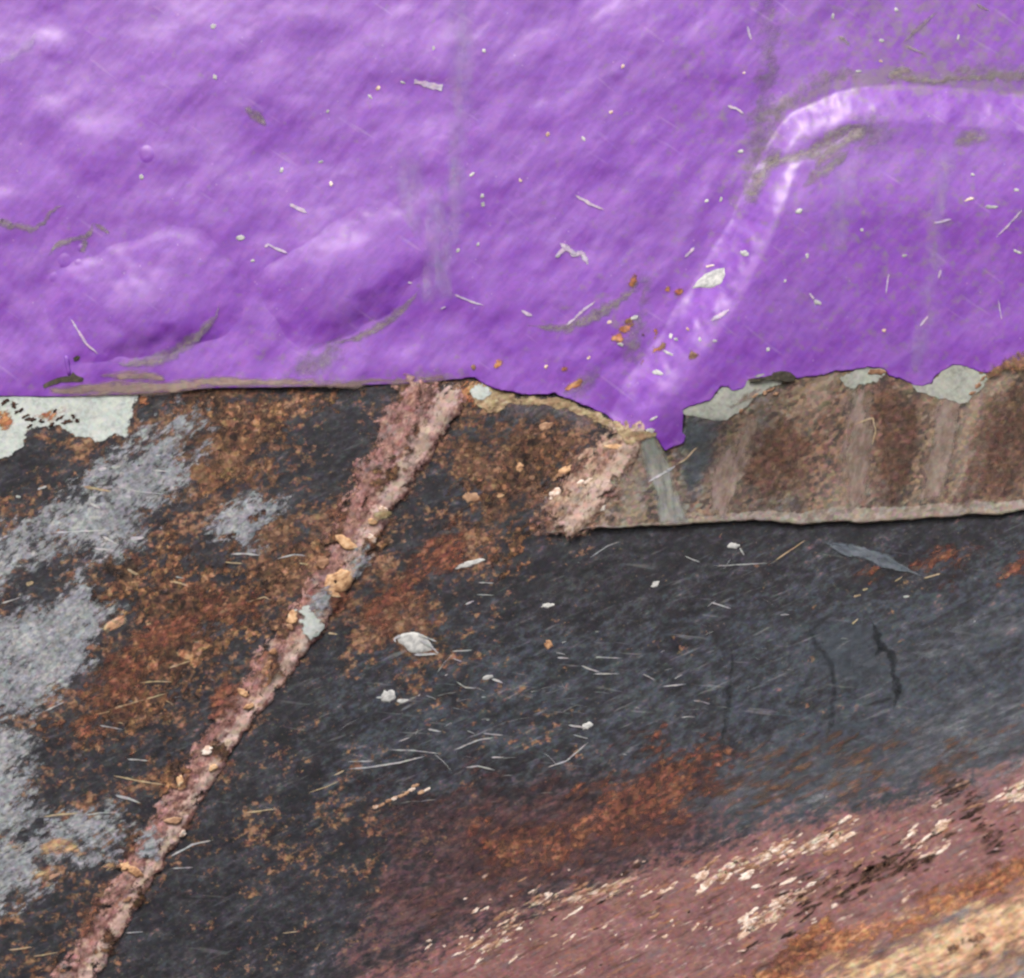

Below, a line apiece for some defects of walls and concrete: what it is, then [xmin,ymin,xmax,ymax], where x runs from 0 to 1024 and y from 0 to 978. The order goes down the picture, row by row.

peeling [470,383,658,445]
peeling [683,371,796,421]
peeling [839,367,887,389]
peeling [911,365,988,499]
rust [684,419,808,517]
peeling [201,489,291,553]
rust [34,382,442,799]
peeling [294,580,337,640]
crack [872,629,900,705]
rust [104,829,144,869]
rust [376,724,905,933]
rust [80,898,120,956]